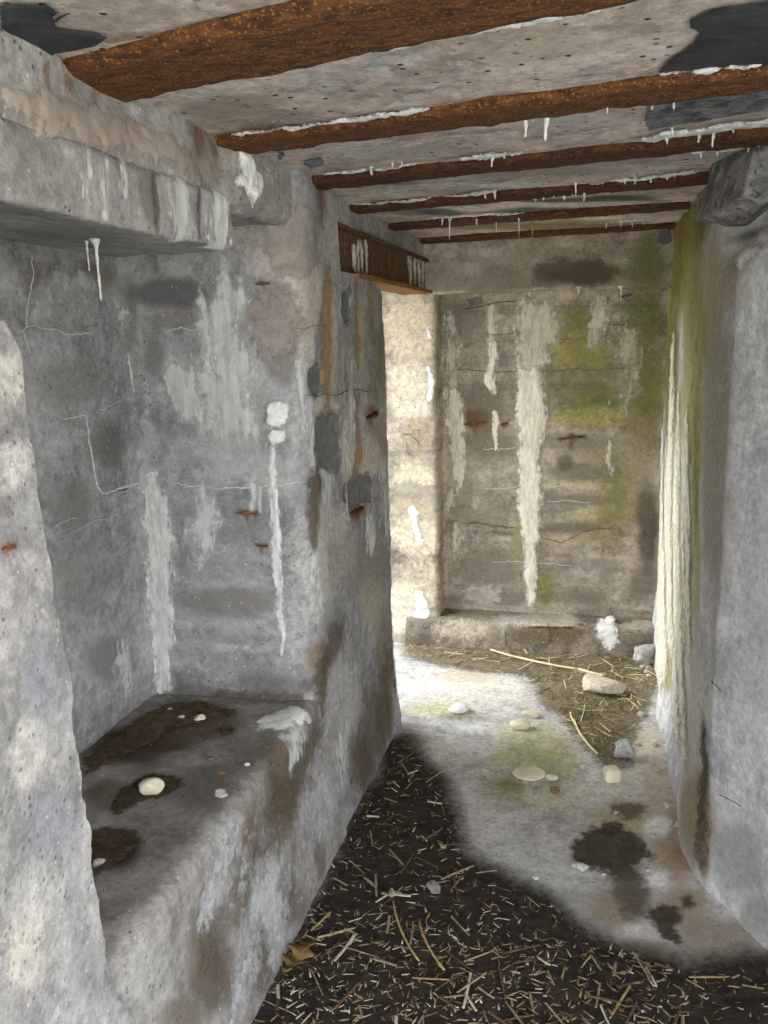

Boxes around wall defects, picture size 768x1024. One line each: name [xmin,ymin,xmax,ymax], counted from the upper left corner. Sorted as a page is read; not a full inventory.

rust [107,9,267,43]
water stain [231,91,442,137]
rust [320,264,333,418]
crack [53,399,141,537]
water stain [137,173,334,694]
crack [176,478,322,490]
rust [353,391,379,481]
crack [491,528,614,566]
water stain [484,258,646,632]
crack [544,485,589,503]
water stain [656,331,710,869]
water stain [569,803,695,944]